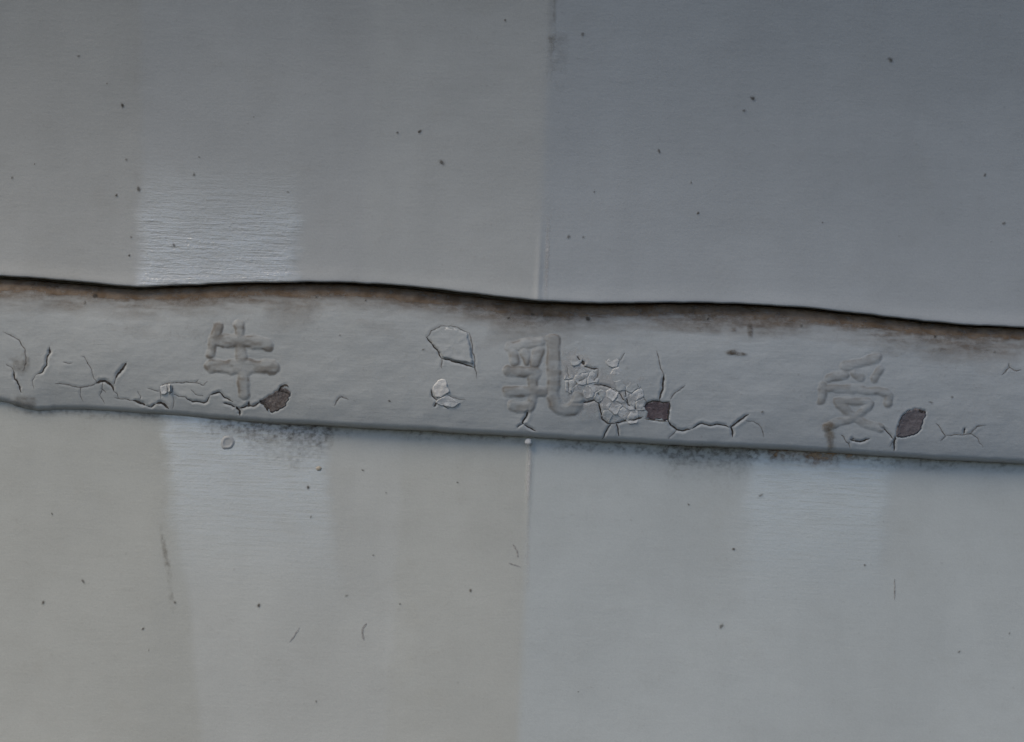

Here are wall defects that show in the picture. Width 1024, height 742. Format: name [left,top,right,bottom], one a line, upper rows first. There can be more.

crack [4,332,260,415]
peeling [259,384,291,413]
peeling [426,325,477,408]
peeling [563,354,670,439]
crack [637,353,764,439]
peeling [896,408,926,438]
crack [936,423,984,446]